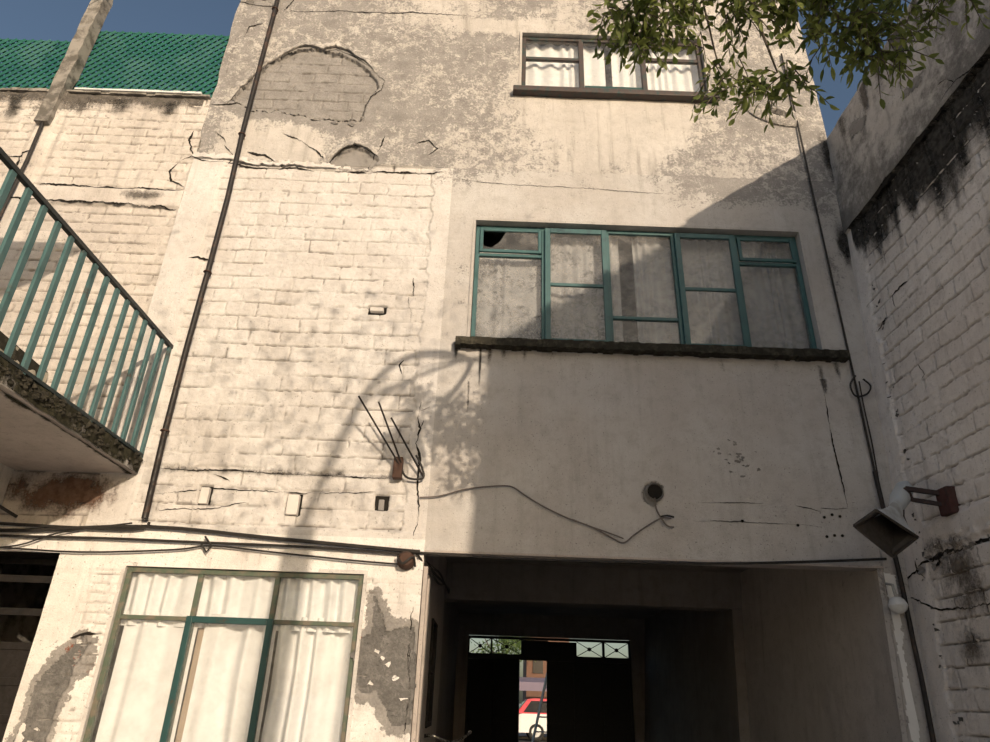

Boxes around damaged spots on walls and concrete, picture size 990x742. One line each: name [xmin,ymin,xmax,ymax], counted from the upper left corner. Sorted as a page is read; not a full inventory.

crack [295,8,453,16]
leakage [0,91,48,116]
leakage [62,91,204,115]
flaking render [220,40,385,171]
leakage [837,46,990,263]
mould [0,356,143,474]
crack [703,379,848,527]
crack [911,597,990,611]
peeling [13,632,99,742]
peeling [350,596,417,734]